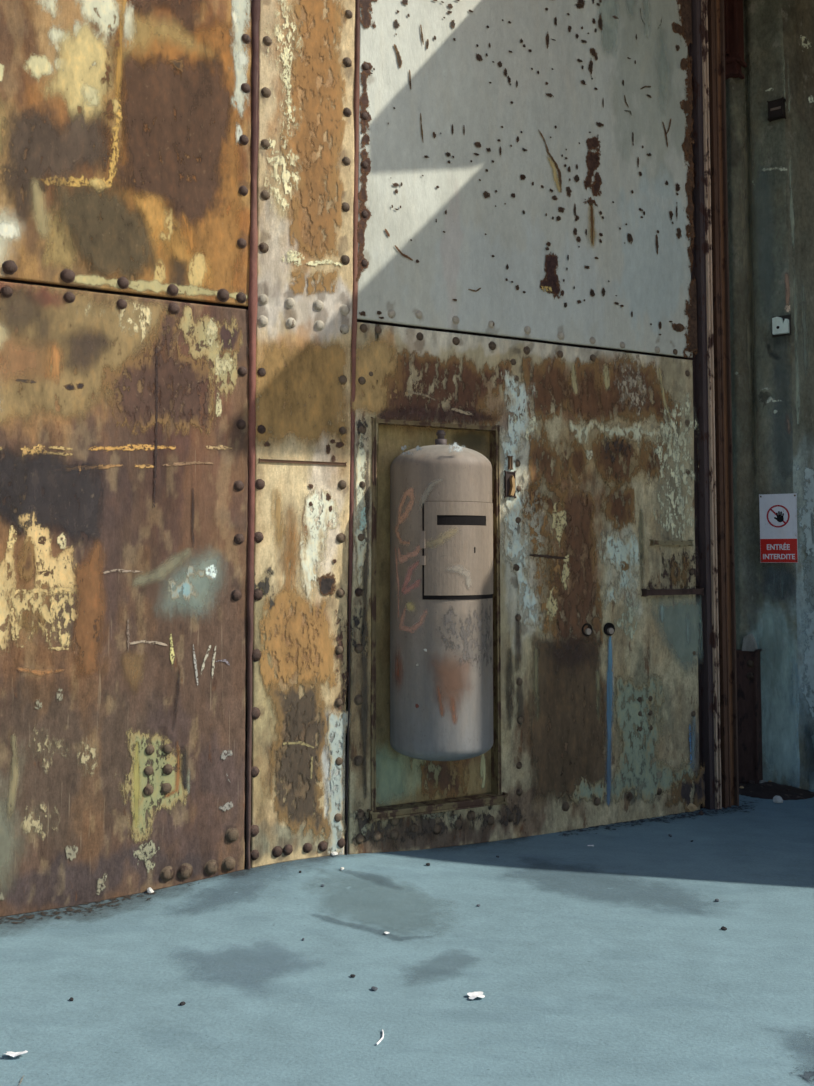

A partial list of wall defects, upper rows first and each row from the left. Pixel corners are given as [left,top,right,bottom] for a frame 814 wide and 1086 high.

peeling [0,217,19,256]
rust [3,0,240,294]
peeling [264,0,301,211]
peeling [281,250,342,266]
rust [281,0,378,295]
rust [539,242,564,299]
rust [583,135,604,245]
rust [672,0,698,358]
rust [256,341,682,842]
peeling [498,369,544,630]
peeling [569,393,697,640]
peeling [121,730,188,872]